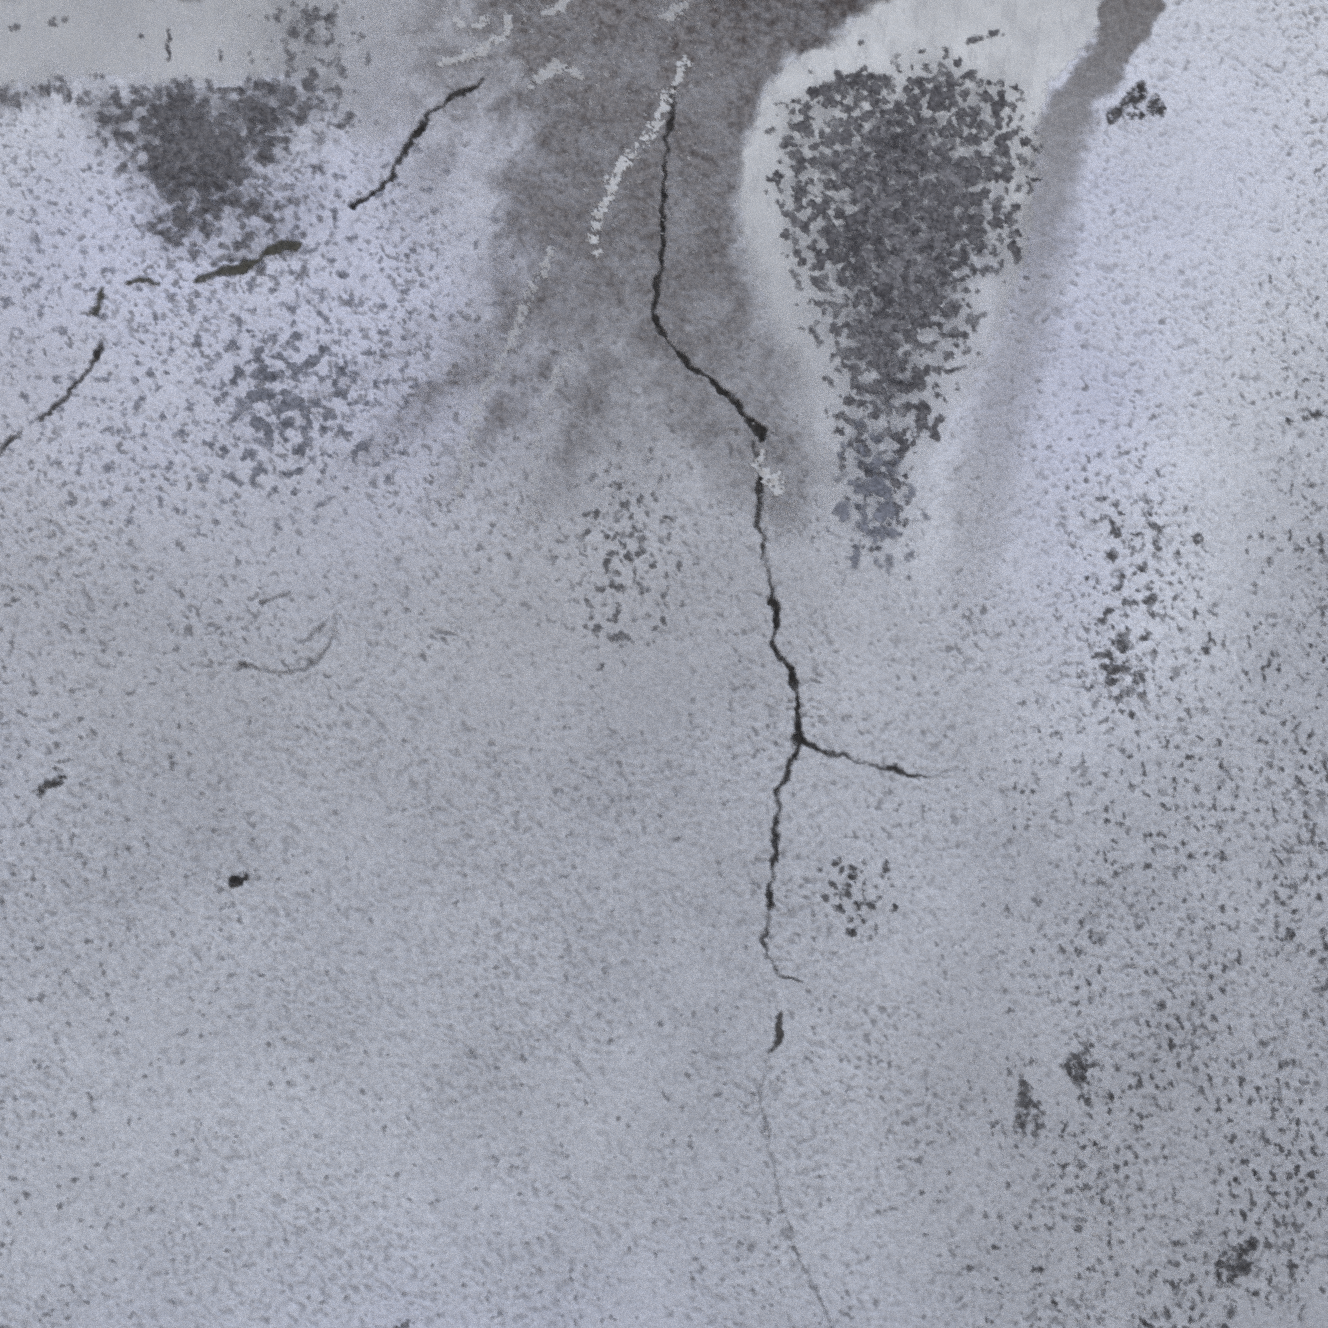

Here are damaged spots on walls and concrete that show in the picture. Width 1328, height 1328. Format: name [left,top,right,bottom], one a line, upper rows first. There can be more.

damp [0,7,362,307]
crack [350,78,484,210]
damp [435,0,866,505]
damp [765,0,1166,568]
crack [0,342,104,453]
damp [202,296,408,506]
damp [582,483,681,641]
crack [651,86,922,982]
damp [1085,497,1172,734]
damp [1275,716,1328,851]
crack [769,1012,784,1052]
damp [1108,988,1231,1130]